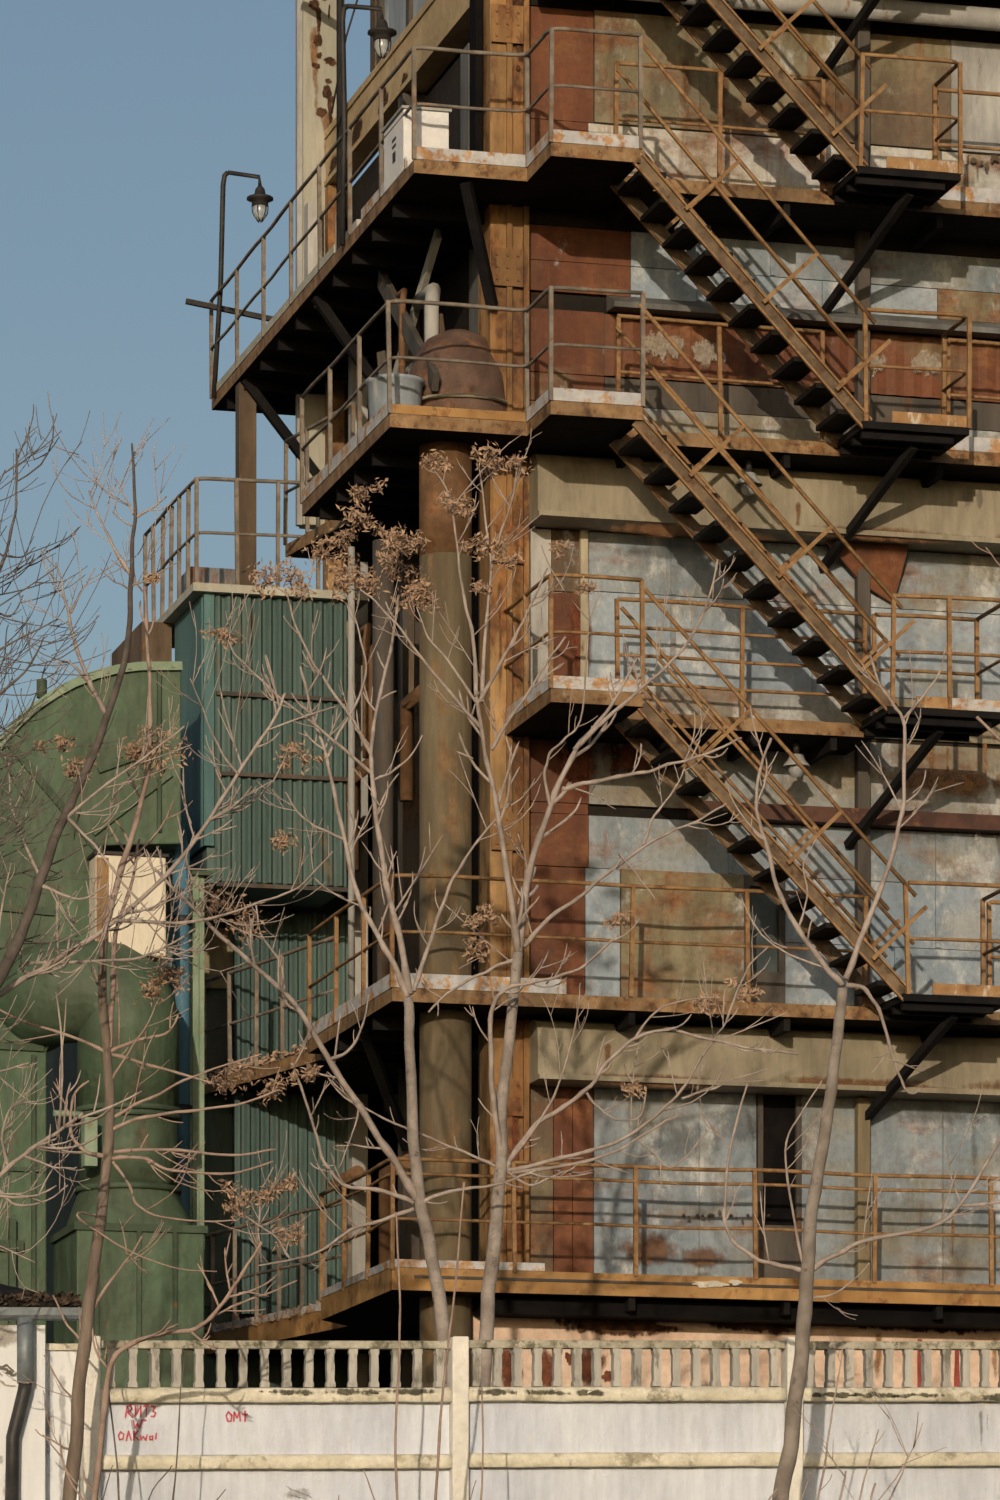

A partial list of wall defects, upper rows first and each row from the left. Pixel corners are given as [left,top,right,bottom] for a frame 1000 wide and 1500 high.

rust [309,0,336,176]
rust [352,73,408,147]
rust [909,743,1000,796]
rust [623,1207,723,1266]
crack [0,1364,17,1386]